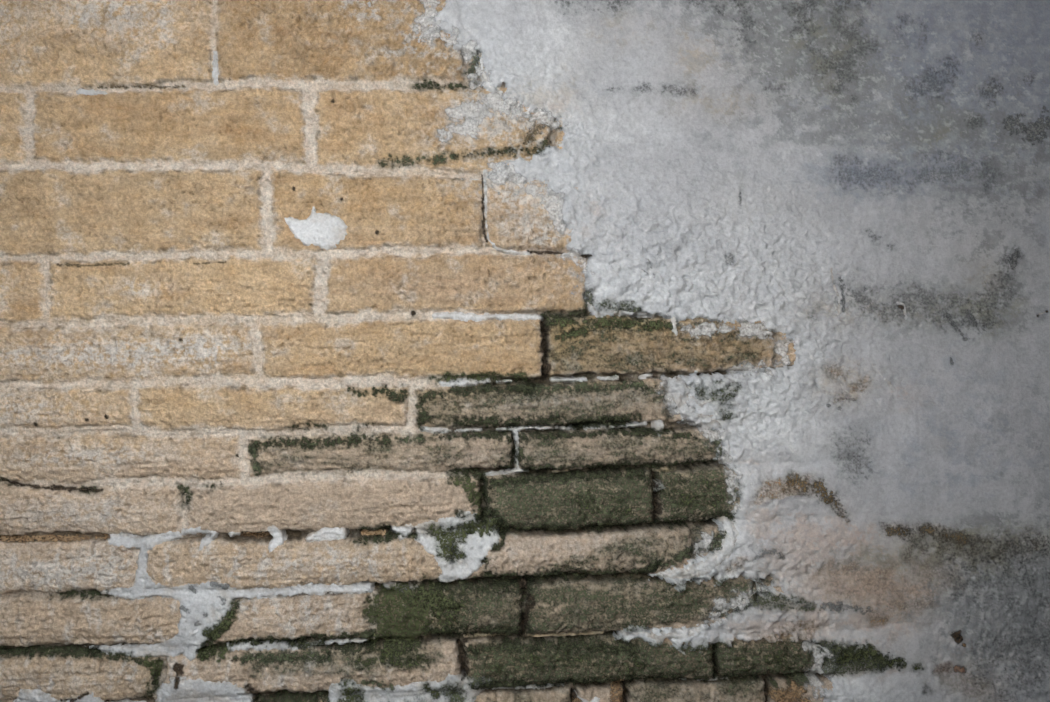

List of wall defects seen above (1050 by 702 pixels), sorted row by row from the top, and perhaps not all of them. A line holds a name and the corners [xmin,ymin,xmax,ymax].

peeling [419,20,503,142]
damp [1003,106,1050,145]
damp [848,288,993,341]
peeling [666,376,721,429]
peeling [496,420,664,437]
peeling [655,451,742,579]
damp [764,474,850,522]
damp [884,523,1049,563]
peeling [308,637,367,648]
damp [520,630,604,638]
peeling [619,582,761,655]
damp [817,643,905,671]